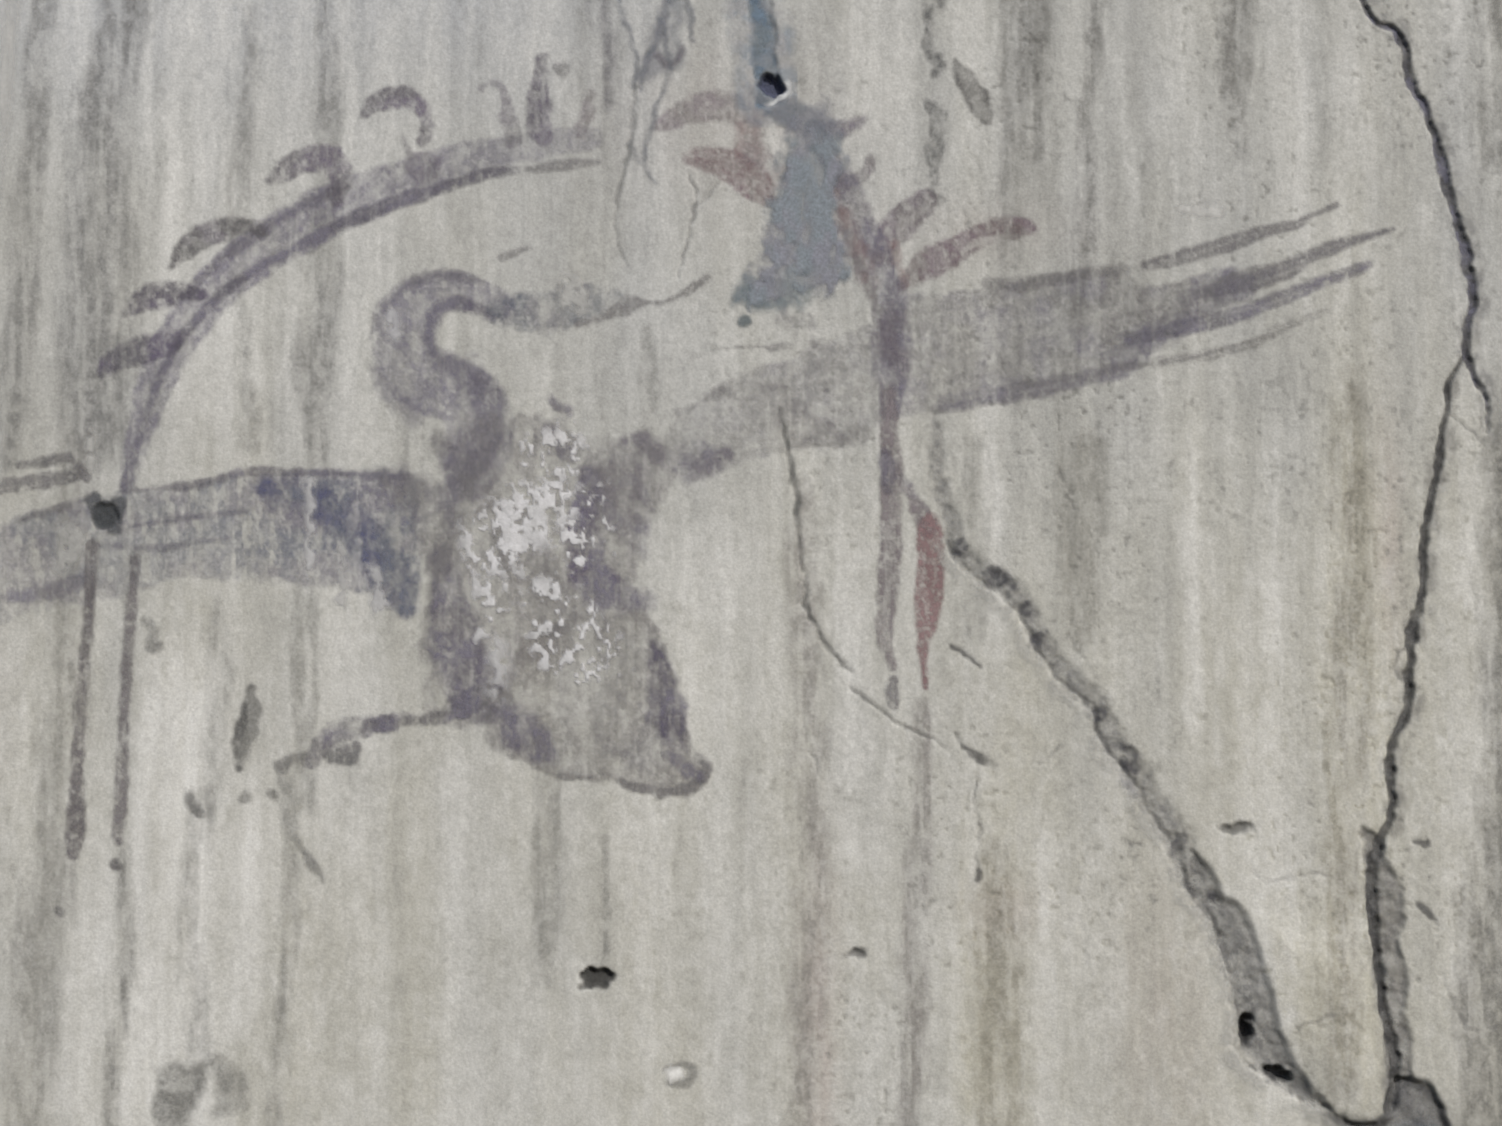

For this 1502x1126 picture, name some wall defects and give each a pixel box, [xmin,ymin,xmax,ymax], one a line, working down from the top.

crack [644,0,681,67]
crack [749,0,776,108]
crack [783,429,800,514]
flaking render [460,429,620,694]
crack [1360,0,1488,1115]
crack [803,596,840,661]
crack [932,424,1314,1102]
flaking render [1334,1079,1450,1126]